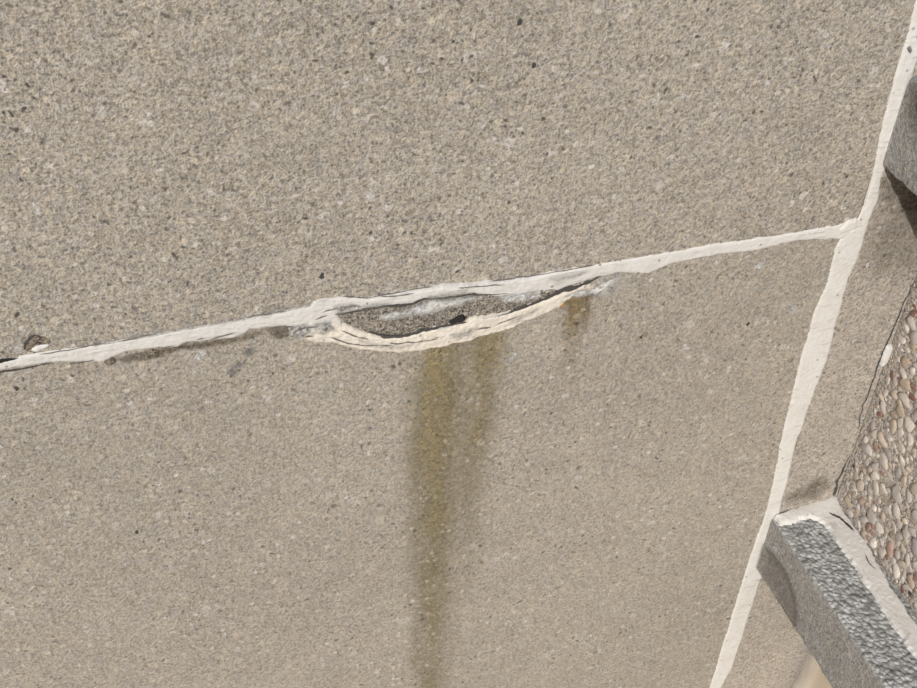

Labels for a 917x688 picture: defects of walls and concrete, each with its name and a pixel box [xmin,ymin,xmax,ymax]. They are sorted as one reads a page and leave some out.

crack [344,287,430,299]
crack [494,265,593,281]
crack [0,311,283,373]
water stain [474,332,498,439]
water stain [419,344,453,633]